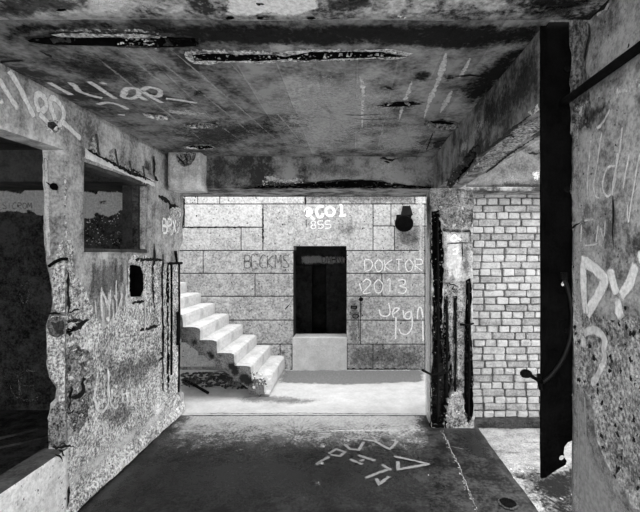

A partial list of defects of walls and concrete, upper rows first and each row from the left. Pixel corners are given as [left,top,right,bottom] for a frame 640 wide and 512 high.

spalling [25,29,413,65]
spalling [373,99,425,109]
spalling [241,104,540,428]
flaking render [0,152,181,500]
crack [442,432,477,508]